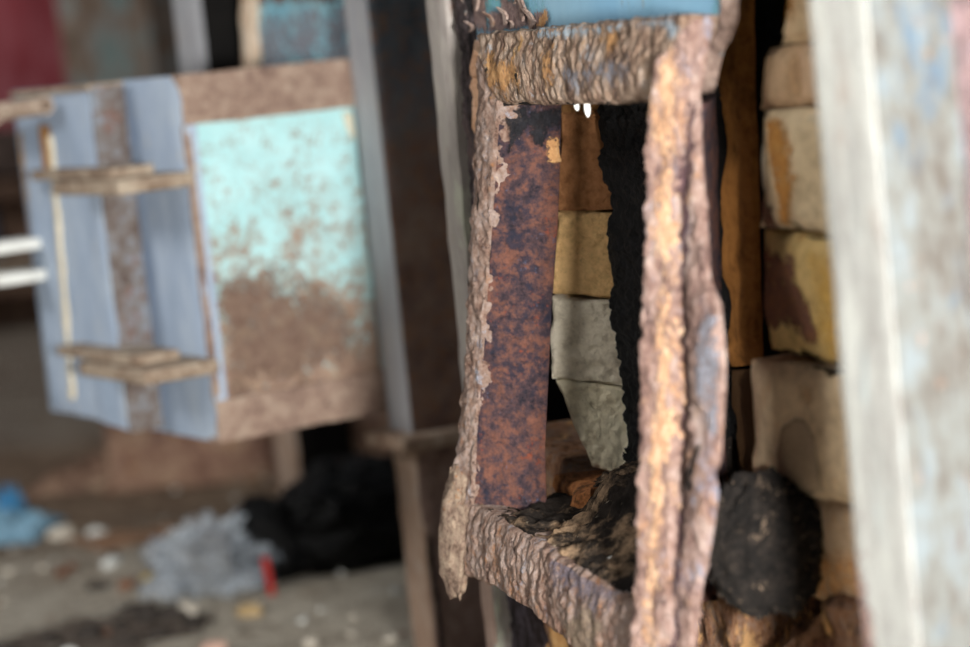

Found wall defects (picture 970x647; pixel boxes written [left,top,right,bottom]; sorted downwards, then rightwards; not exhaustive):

rust [258,0,350,67]
rust [483,48,522,102]
peeling [454,0,623,209]
rust [540,25,629,94]
rust [546,137,561,163]
rust [214,268,360,396]
rust [642,44,698,647]
rust [480,581,498,647]
rust [506,595,549,647]
spalling [546,627,568,647]
rust [550,560,614,647]